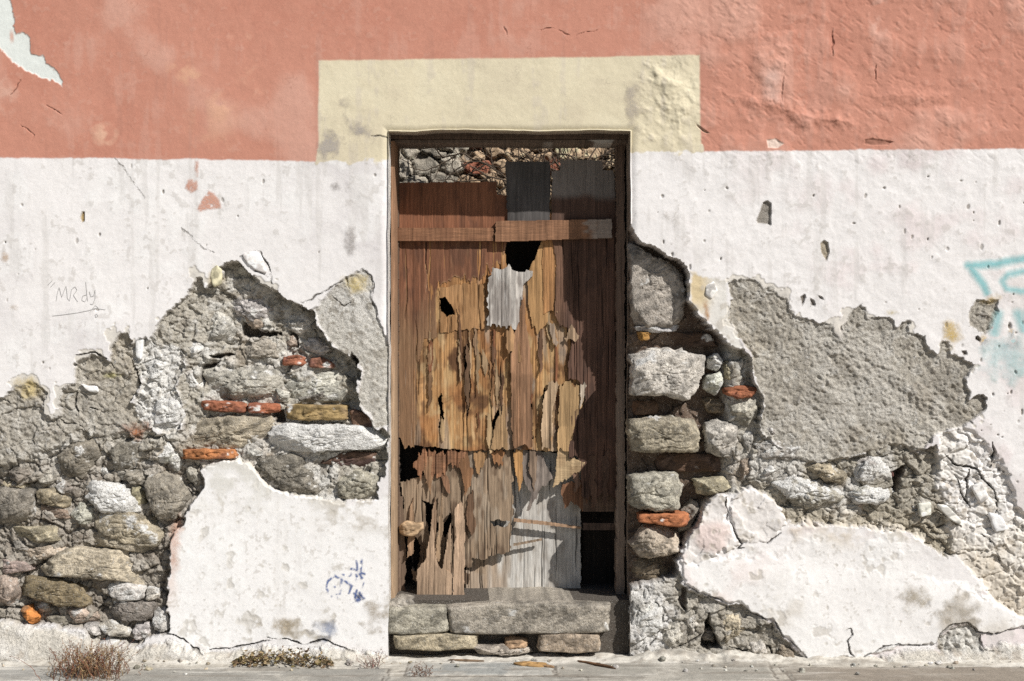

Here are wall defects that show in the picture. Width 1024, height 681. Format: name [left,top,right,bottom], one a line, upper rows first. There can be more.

peeling [0,0,63,88]
spalling [756,200,772,226]
spalling [0,251,390,646]
spalling [625,224,1024,658]
crack [925,441,1001,562]
crack [157,630,356,657]
crack [844,621,1024,657]